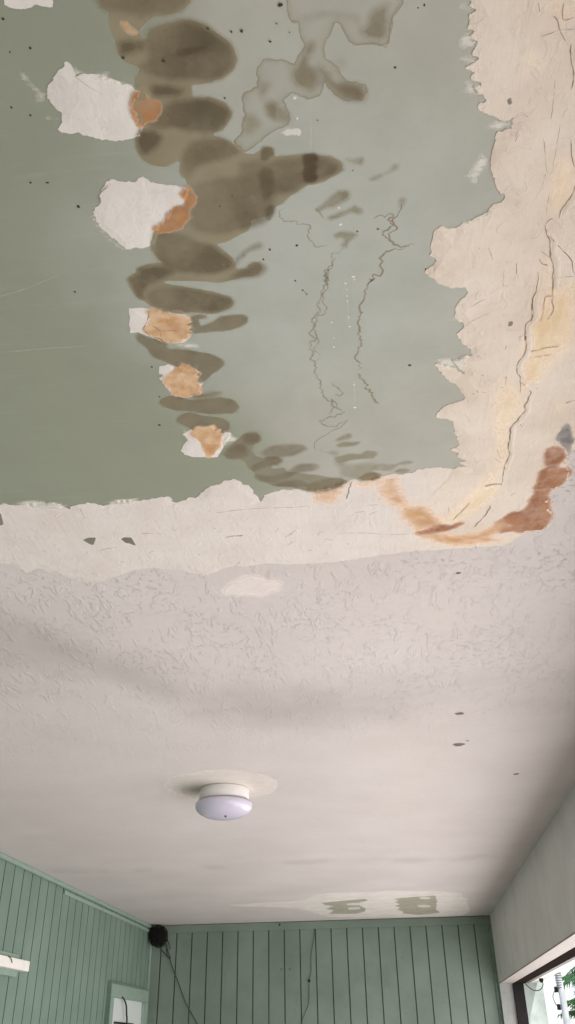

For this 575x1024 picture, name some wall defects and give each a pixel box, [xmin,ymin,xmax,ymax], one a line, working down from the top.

damp [330,2,403,46]
damp [98,0,368,333]
crack [454,3,575,527]
damp [136,334,346,492]
damp [320,382,376,462]
damp [359,472,381,481]
rust [382,447,572,545]
spalling [556,424,574,464]